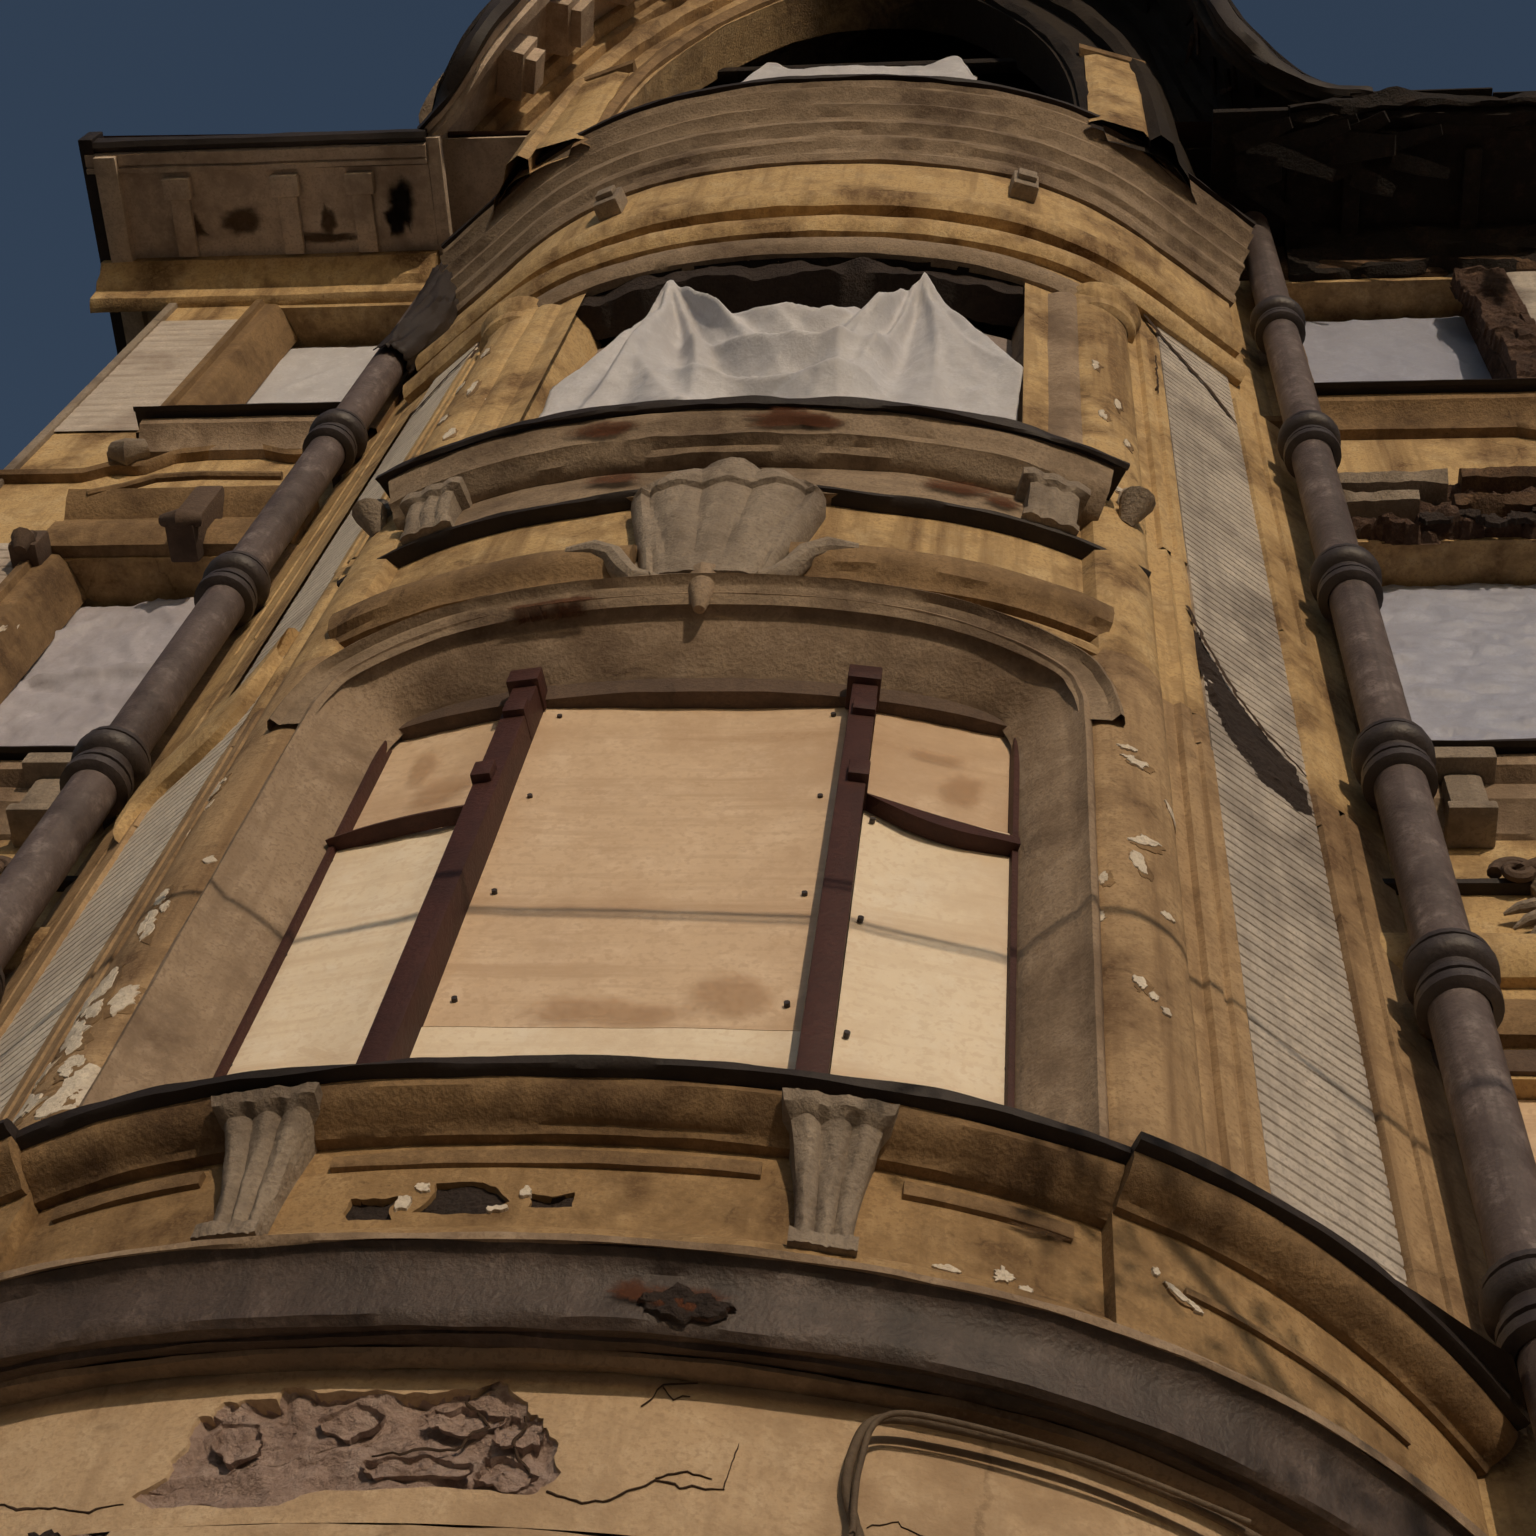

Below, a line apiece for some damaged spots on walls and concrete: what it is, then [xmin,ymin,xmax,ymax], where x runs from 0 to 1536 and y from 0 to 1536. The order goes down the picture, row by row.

flaking render [1450,265,1536,379]
flaking render [1338,466,1536,545]
peeling [204,773,232,811]
peeling [137,884,175,945]
peeling [13,964,147,1126]
flaking render [346,1182,574,1221]
rust [608,1279,737,1324]
crack [640,1382,698,1407]
flaking render [135,1381,560,1509]
crack [546,1444,739,1505]
crack [0,1503,124,1515]